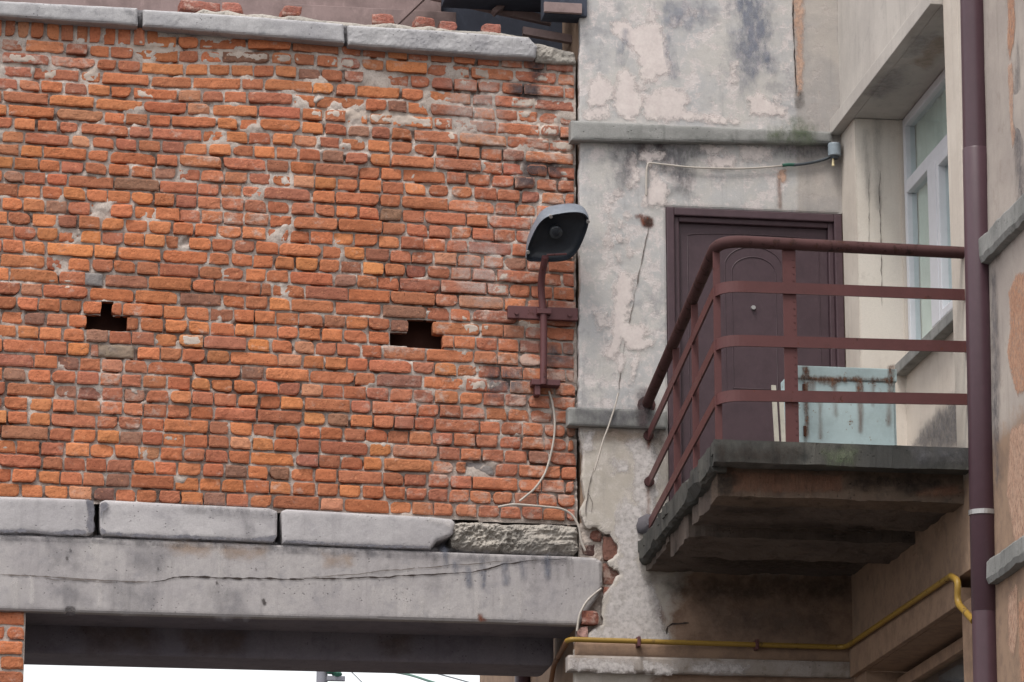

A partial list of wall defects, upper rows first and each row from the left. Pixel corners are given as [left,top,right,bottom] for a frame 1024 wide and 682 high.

peeling [581,8,786,124]
spalling [792,0,804,93]
hole [85,303,127,332]
hole [390,320,442,349]
peeling [593,272,653,384]
crack [619,227,649,383]
spalling [1007,274,1024,394]
crack [0,558,567,583]
peeling [583,431,594,450]
peeling [575,437,669,640]
spalling [1007,425,1024,540]